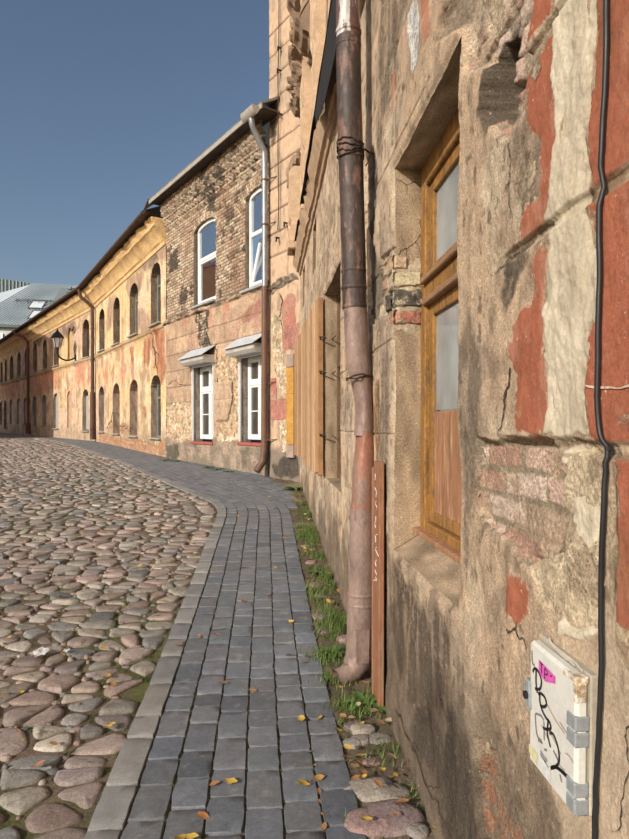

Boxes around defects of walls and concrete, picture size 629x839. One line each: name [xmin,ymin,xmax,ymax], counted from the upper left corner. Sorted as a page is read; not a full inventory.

spalling [442,0,541,146]
spalling [194,310,212,348]
spalling [270,273,299,452]
spalling [477,436,618,642]
water stain [393,568,476,839]
peeling [615,620,629,669]
crack [612,725,629,837]